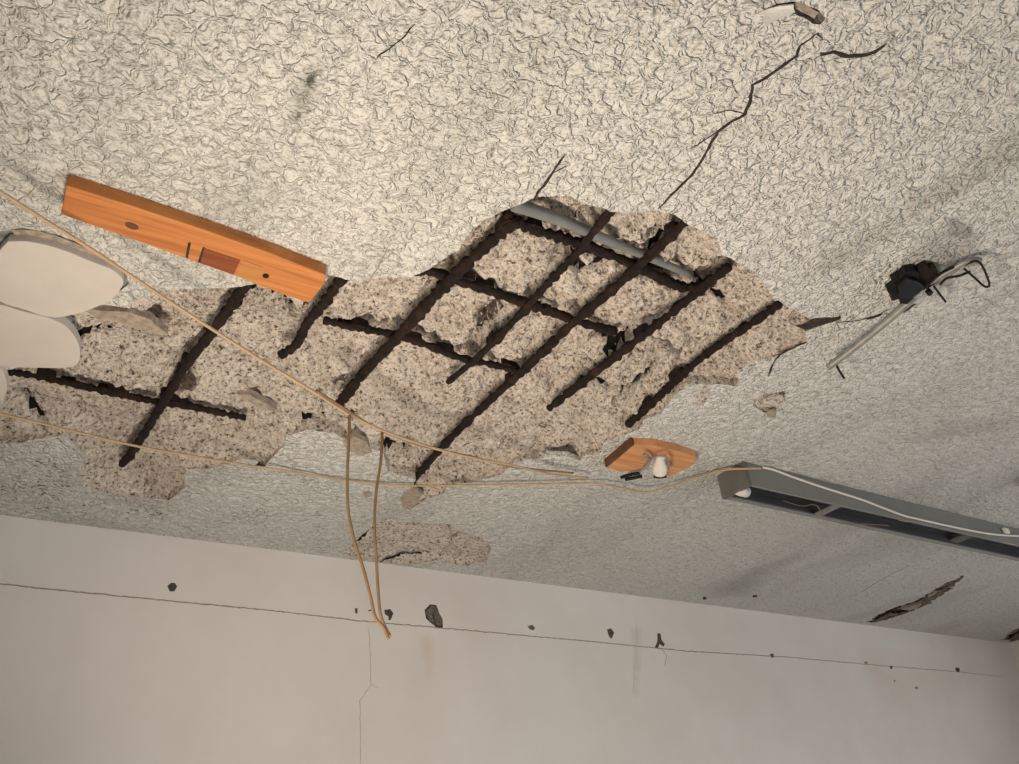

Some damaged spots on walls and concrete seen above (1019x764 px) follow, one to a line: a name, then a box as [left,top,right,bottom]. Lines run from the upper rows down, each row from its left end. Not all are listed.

crack [533,154,566,200]
crack [658,33,887,209]
spalling [0,196,841,566]
crack [0,583,1001,762]
spalling [1001,628,1019,642]